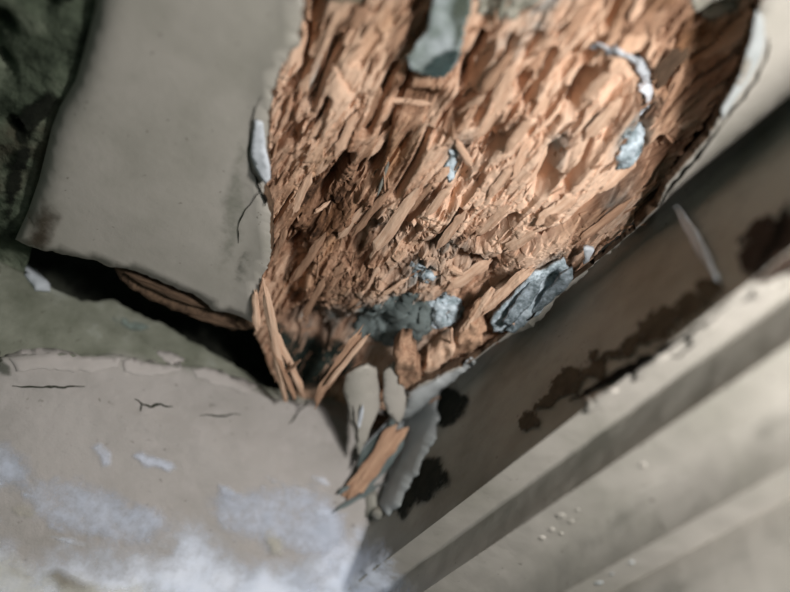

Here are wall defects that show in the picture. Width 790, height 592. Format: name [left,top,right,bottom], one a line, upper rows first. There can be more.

peeling [405,0,540,78]
damp [5,92,58,219]
peeling [518,10,770,431]
peeling [349,292,464,347]
peeling [490,257,573,333]
crack [16,383,85,391]
crack [135,399,173,411]
peeling [343,361,406,455]
peeling [437,386,469,428]
damp [136,455,172,469]
peeling [397,457,448,519]
damp [0,487,398,592]